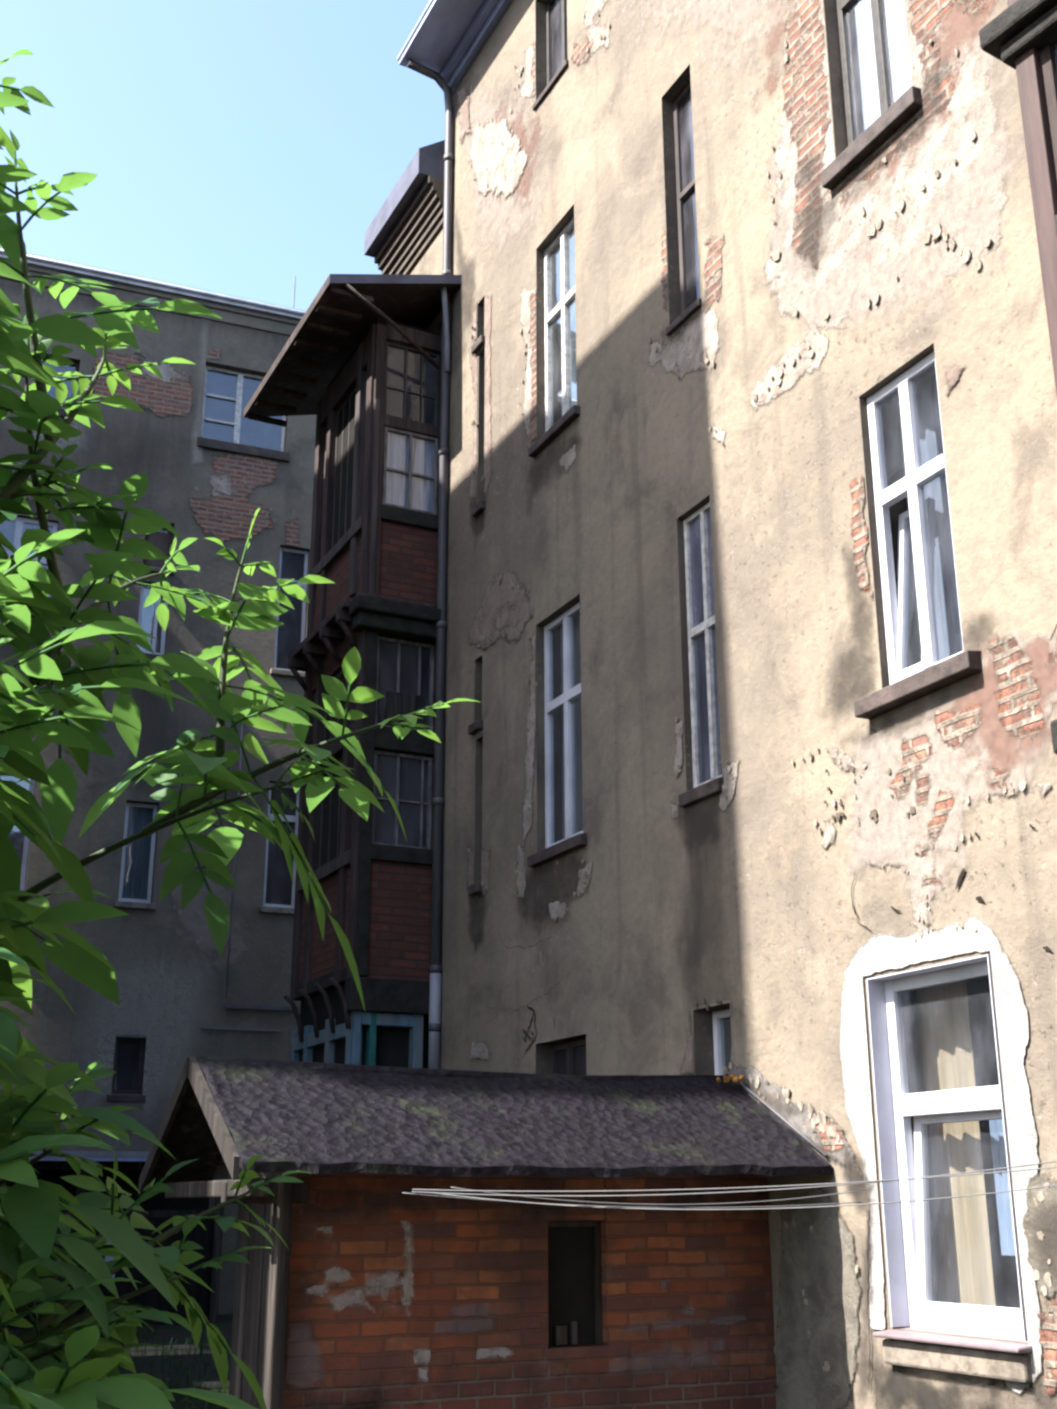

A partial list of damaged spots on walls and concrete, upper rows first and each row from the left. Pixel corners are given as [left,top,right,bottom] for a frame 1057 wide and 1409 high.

flaking render [571,0,610,66]
flaking render [91,349,194,418]
flaking render [456,42,541,250]
spalling [647,231,725,382]
flaking render [750,0,1010,411]
flaking render [189,452,301,546]
flaking render [522,637,537,847]
flaking render [791,629,1057,942]